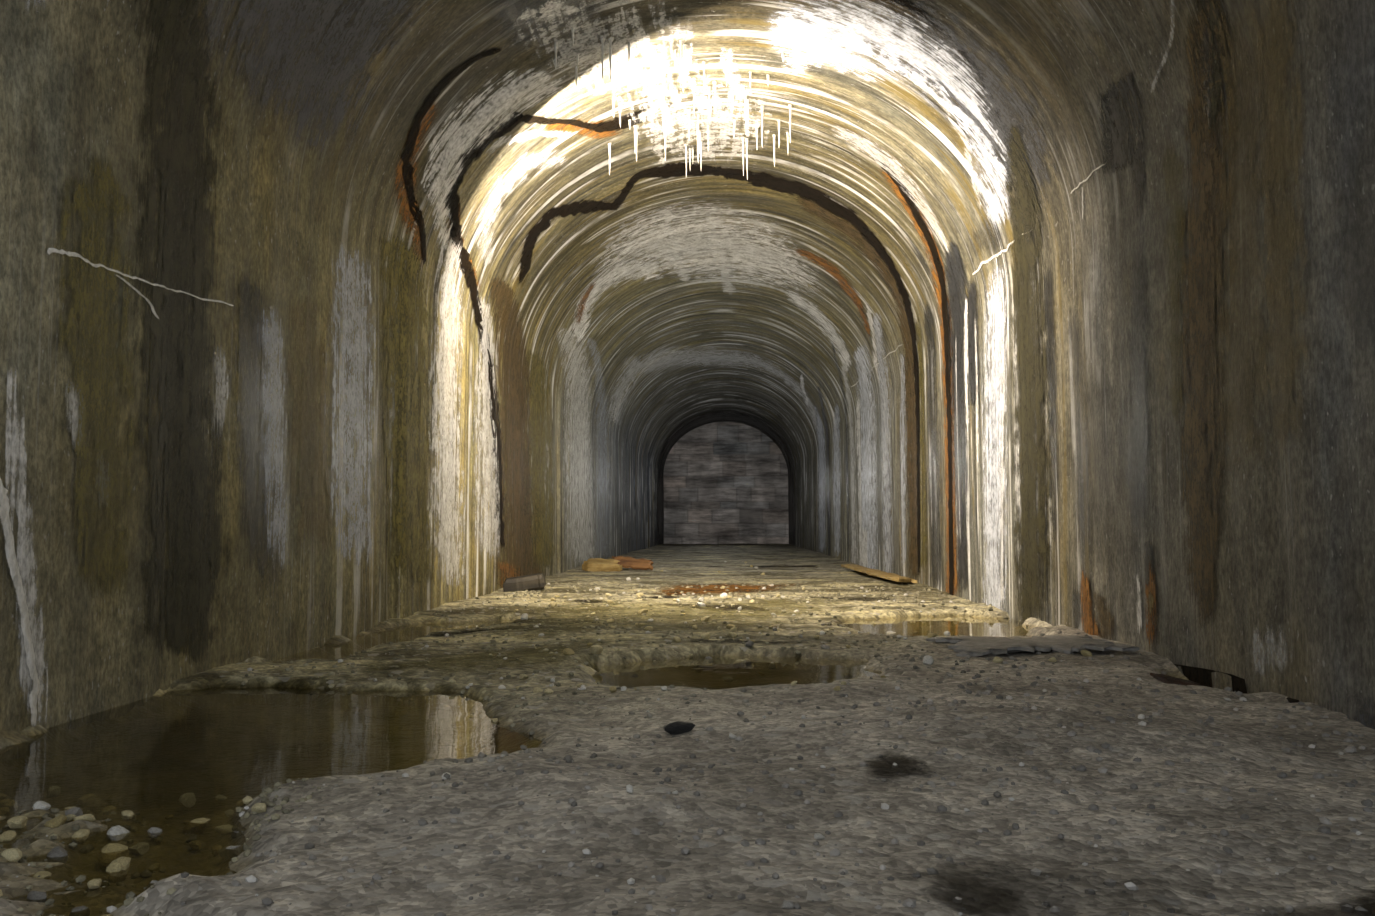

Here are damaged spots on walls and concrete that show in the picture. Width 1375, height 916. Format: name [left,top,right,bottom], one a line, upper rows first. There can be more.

water stain [205,0,436,159]
water stain [65,387,83,445]
water stain [289,0,769,584]
crack [395,49,672,546]
crack [519,158,1031,596]
water stain [635,596,763,611]
rust [1072,571,1114,641]
rust [1136,541,1156,647]